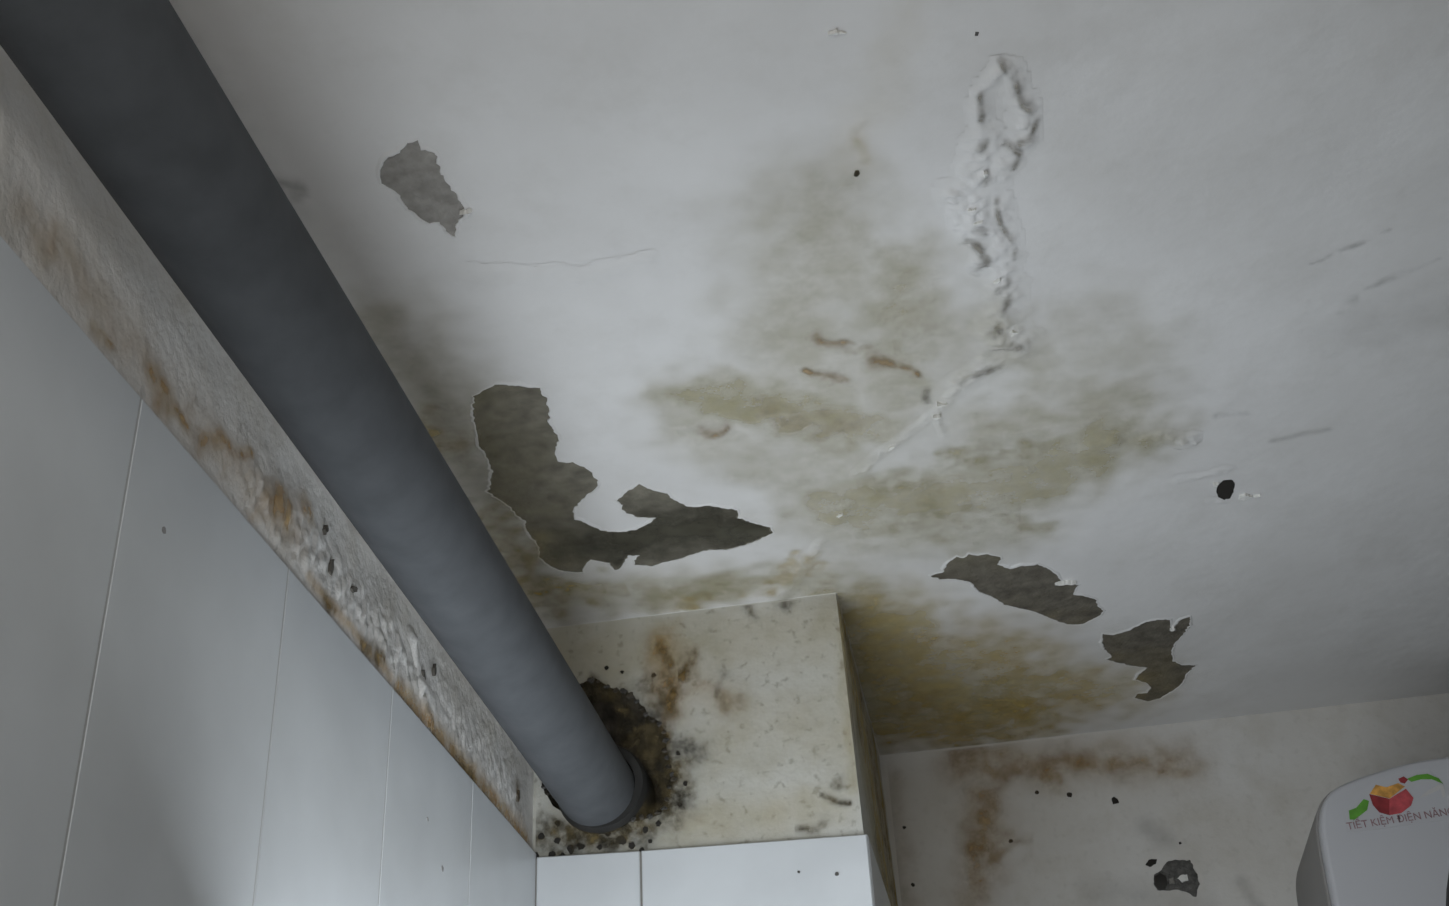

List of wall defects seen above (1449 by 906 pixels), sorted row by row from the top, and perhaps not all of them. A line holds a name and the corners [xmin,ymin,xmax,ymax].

peeling [375,137,472,239]
damp [670,379,880,438]
damp [871,358,920,377]
peeling [469,381,775,573]
damp [807,419,1150,528]
peeling [928,552,1198,702]
spalling [541,783,560,810]
damp [535,666,695,858]
spalling [580,676,677,822]
damp [839,587,1110,906]
spalling [1146,859,1200,897]